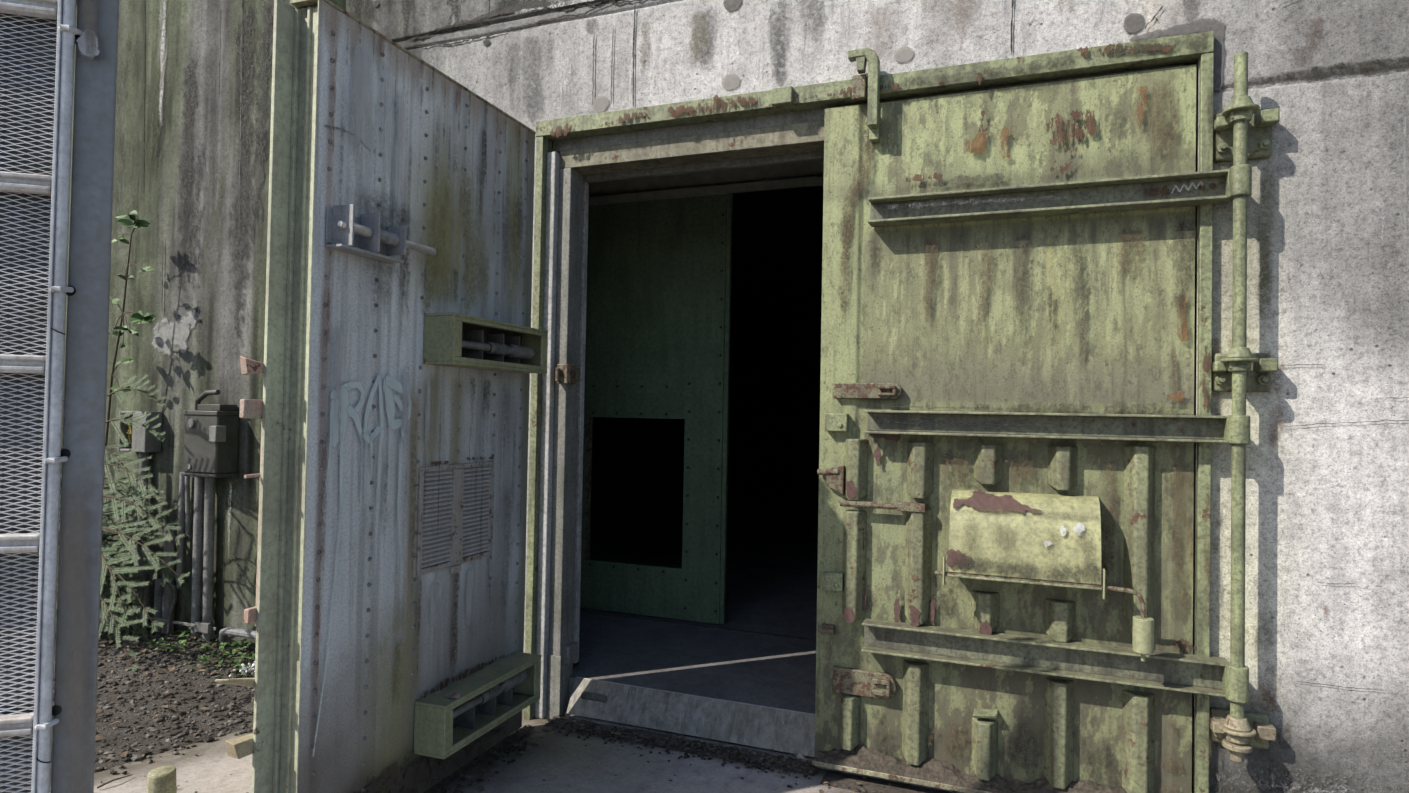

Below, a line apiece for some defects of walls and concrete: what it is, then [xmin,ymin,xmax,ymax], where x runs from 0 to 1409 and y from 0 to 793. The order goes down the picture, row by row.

water stain [756,0,848,84]
water stain [177,59,204,318]
water stain [227,4,272,335]
corrosion [668,95,761,117]
corrosion [1044,83,1176,174]
peeling [152,309,201,357]